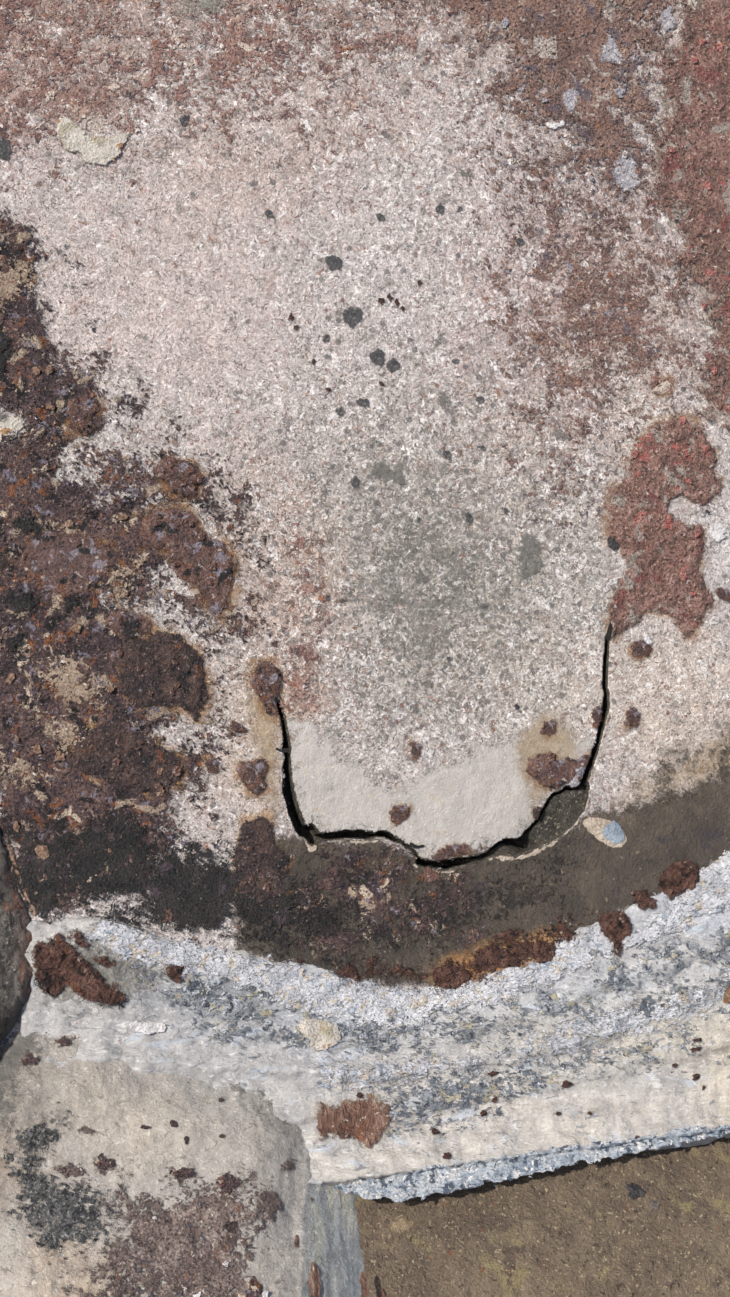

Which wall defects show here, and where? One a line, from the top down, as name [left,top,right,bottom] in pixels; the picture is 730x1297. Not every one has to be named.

rust [0,0,730,997]
crack [276,621,612,873]
rust [20,1050,41,1066]
rust [55,1036,75,1048]
rust [316,1092,392,1149]